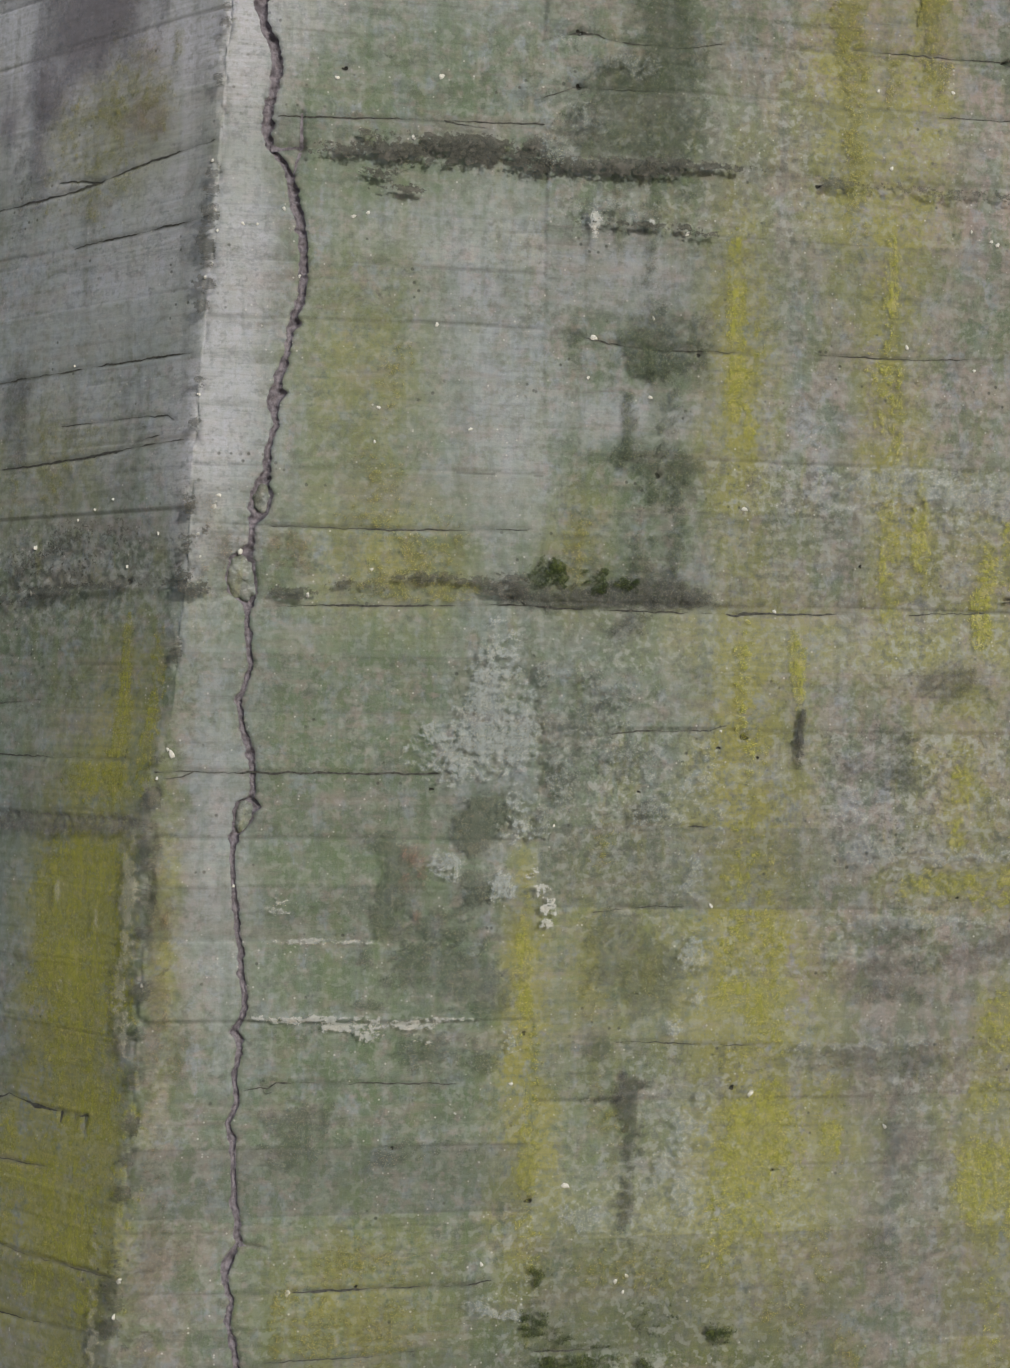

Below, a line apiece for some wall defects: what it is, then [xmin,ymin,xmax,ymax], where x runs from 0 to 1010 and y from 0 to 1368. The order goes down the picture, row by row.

leakage [31,0,140,171]
crack [0,139,215,212]
crack [74,217,202,250]
leakage [589,211,603,241]
crack [1,353,185,384]
crack [3,415,194,470]
crack [291,596,835,617]
crack [155,0,670,1368]
crack [0,752,99,760]
crack [0,1092,88,1132]